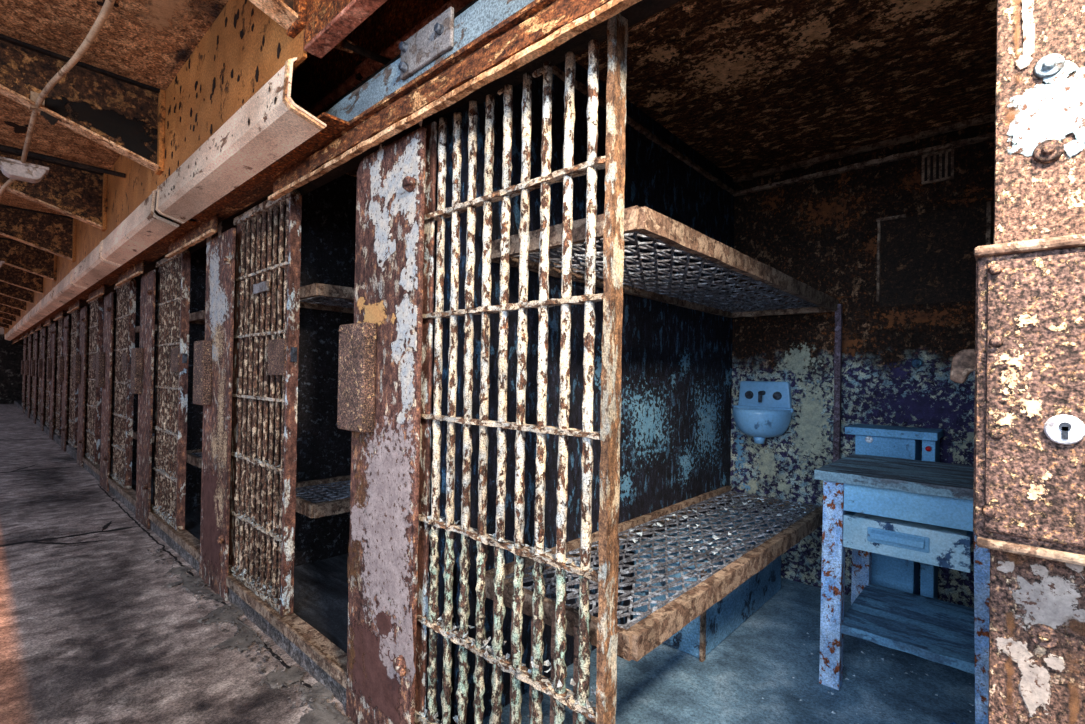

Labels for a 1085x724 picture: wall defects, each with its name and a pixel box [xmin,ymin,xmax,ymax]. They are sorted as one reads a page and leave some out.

peeling [1006,60,1085,159]
peeling [350,120,599,718]
peeling [594,346,602,394]
corrosion [202,467,226,576]
peeling [995,561,1085,718]